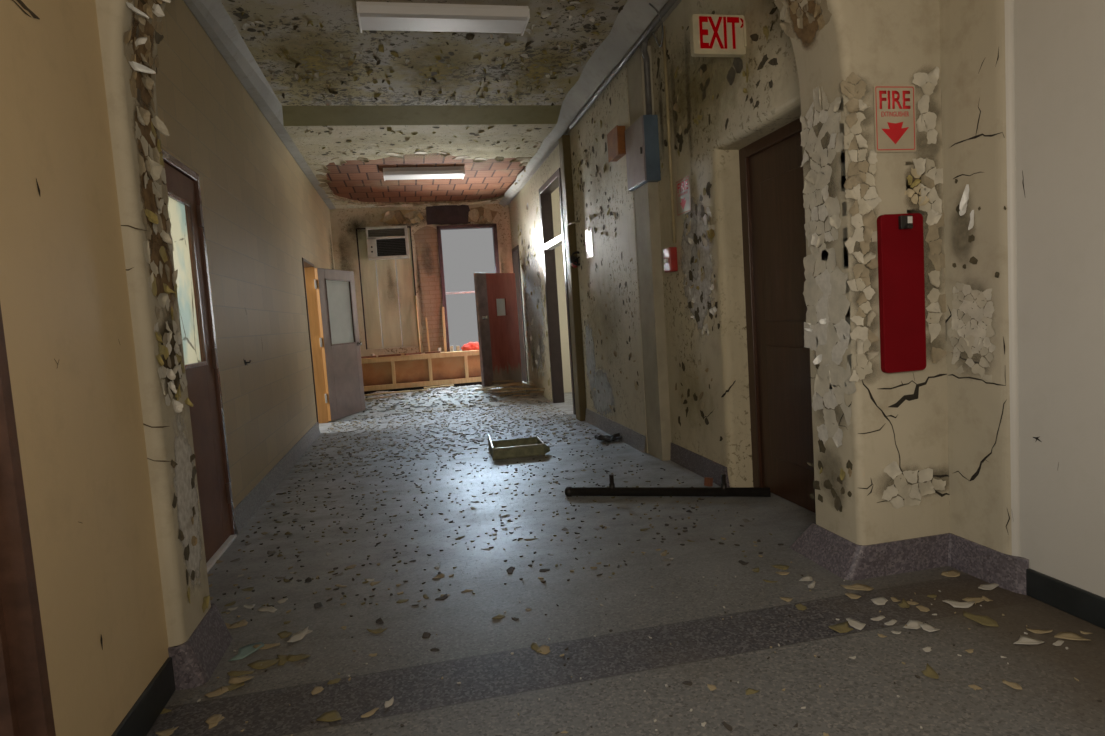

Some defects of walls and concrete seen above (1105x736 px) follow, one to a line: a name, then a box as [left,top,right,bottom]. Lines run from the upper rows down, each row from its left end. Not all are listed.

peeling [123,0,210,613]
spalling [304,125,552,206]
peeling [274,0,624,107]
peeling [573,117,618,247]
peeling [581,258,639,415]
peeling [656,42,719,156]
peeling [682,182,720,336]
peeling [727,54,778,108]
peeling [750,0,832,47]
peeling [800,72,882,512]
peeling [904,67,1000,383]
crack [838,337,1006,503]